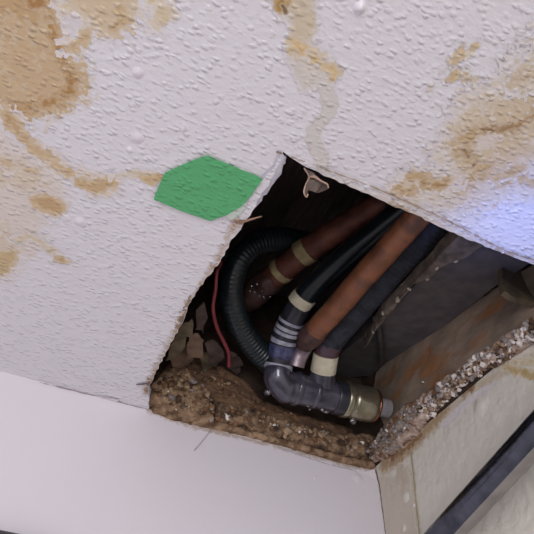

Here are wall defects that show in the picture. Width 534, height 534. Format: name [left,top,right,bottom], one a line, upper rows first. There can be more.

leakage [0,0,182,289]
flaking render [227,151,286,220]
leakage [265,0,344,171]
leakage [372,21,534,222]
spalling [149,319,534,485]